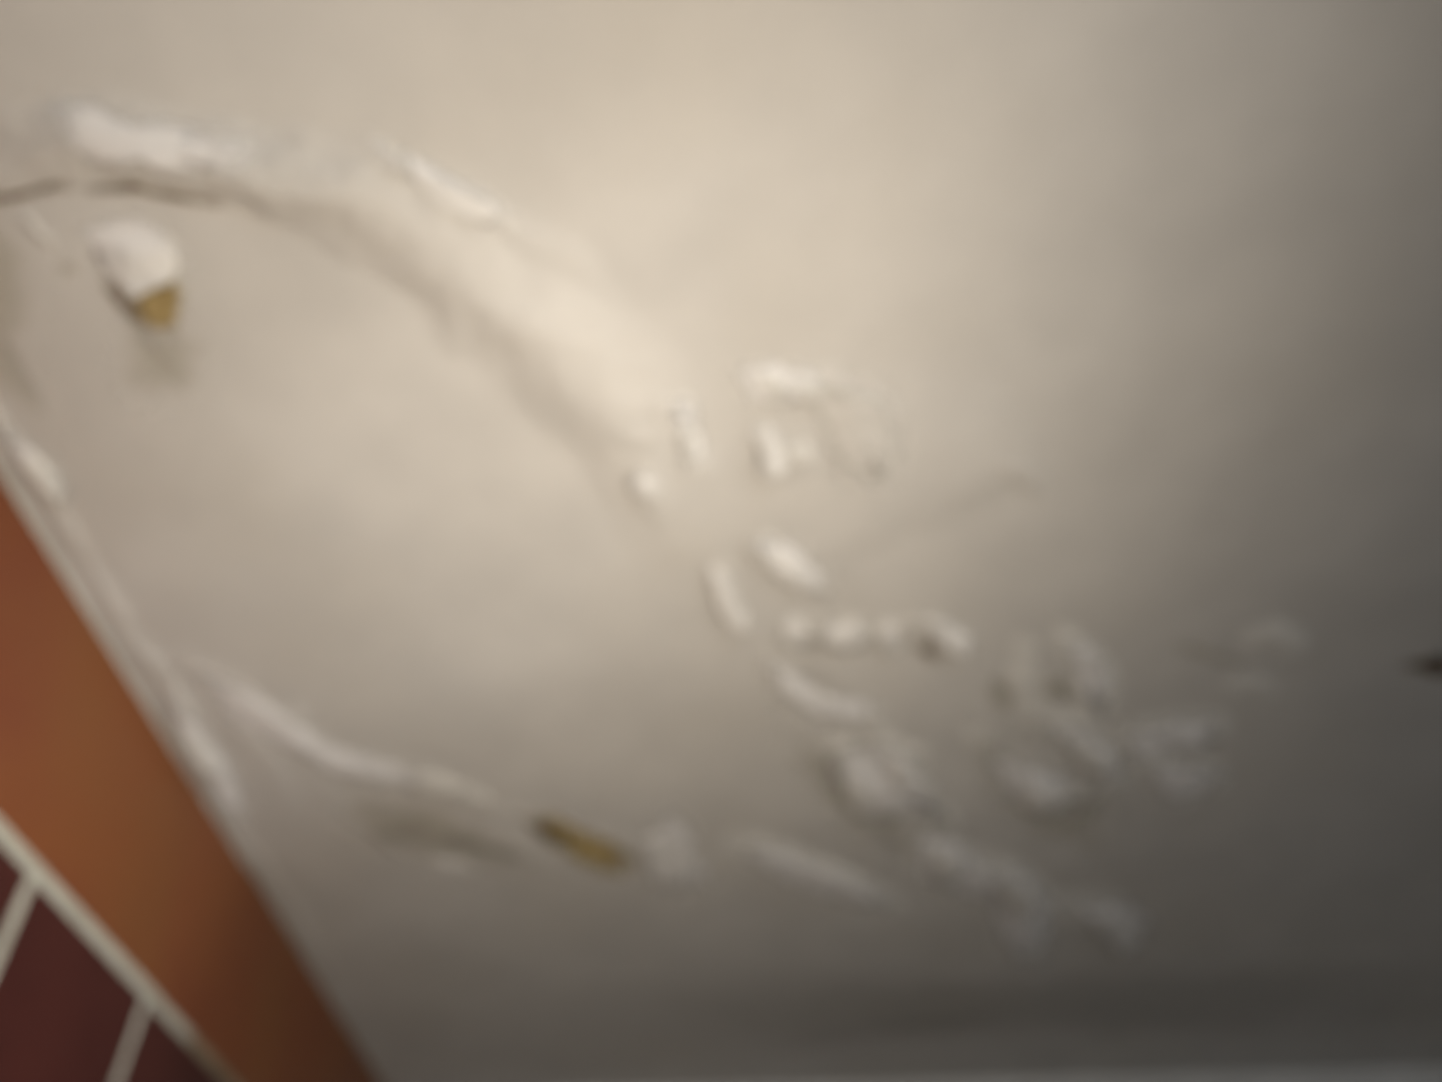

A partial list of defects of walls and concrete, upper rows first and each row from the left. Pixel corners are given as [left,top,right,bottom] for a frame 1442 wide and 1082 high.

peeling [0,137,93,201]
peeling [83,219,179,329]
peeling [701,521,979,658]
peeling [823,718,961,831]